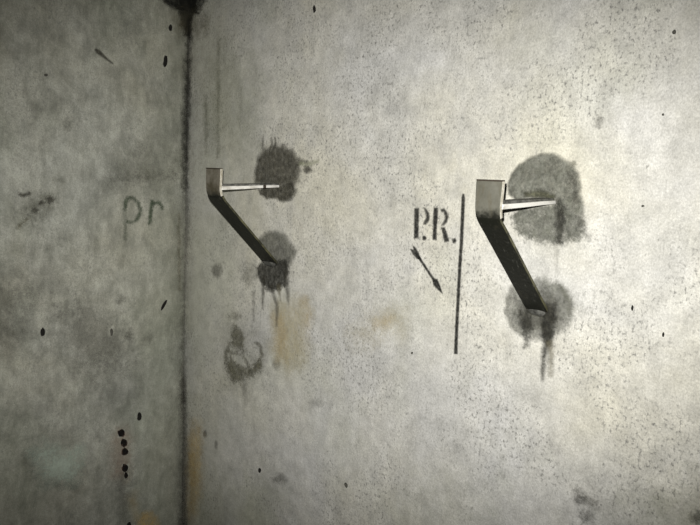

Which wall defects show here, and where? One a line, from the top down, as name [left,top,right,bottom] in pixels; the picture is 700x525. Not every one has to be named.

leakage [164,0,204,35]
leakage [524,191,565,242]
leakage [231,326,244,349]
leakage [227,344,263,382]